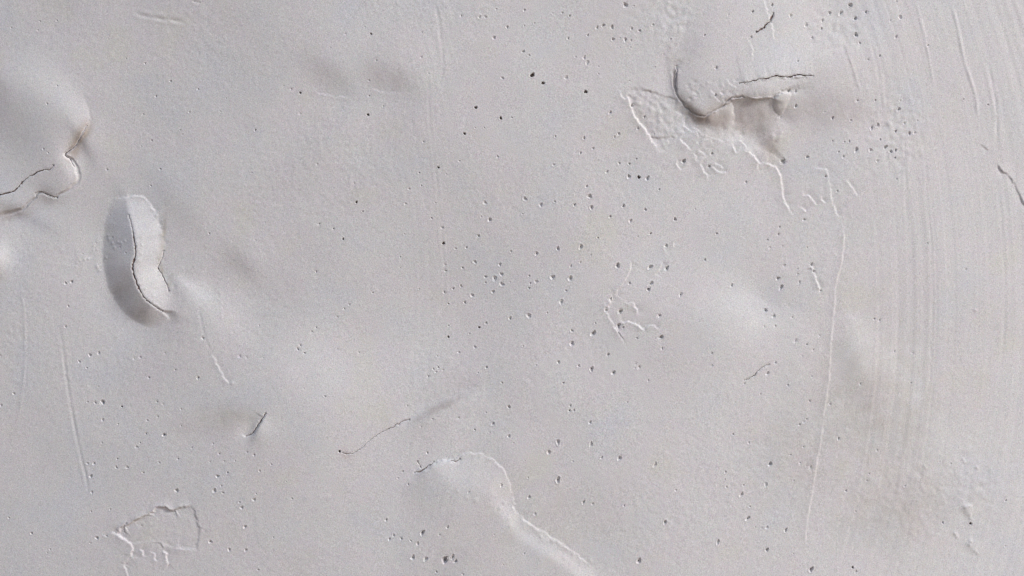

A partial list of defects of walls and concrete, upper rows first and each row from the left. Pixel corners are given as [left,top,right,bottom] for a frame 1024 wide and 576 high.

spalling [603,0,919,236]
crack [246,412,267,437]
crack [341,418,409,456]
peeling [93,487,214,576]
spalling [383,516,459,566]